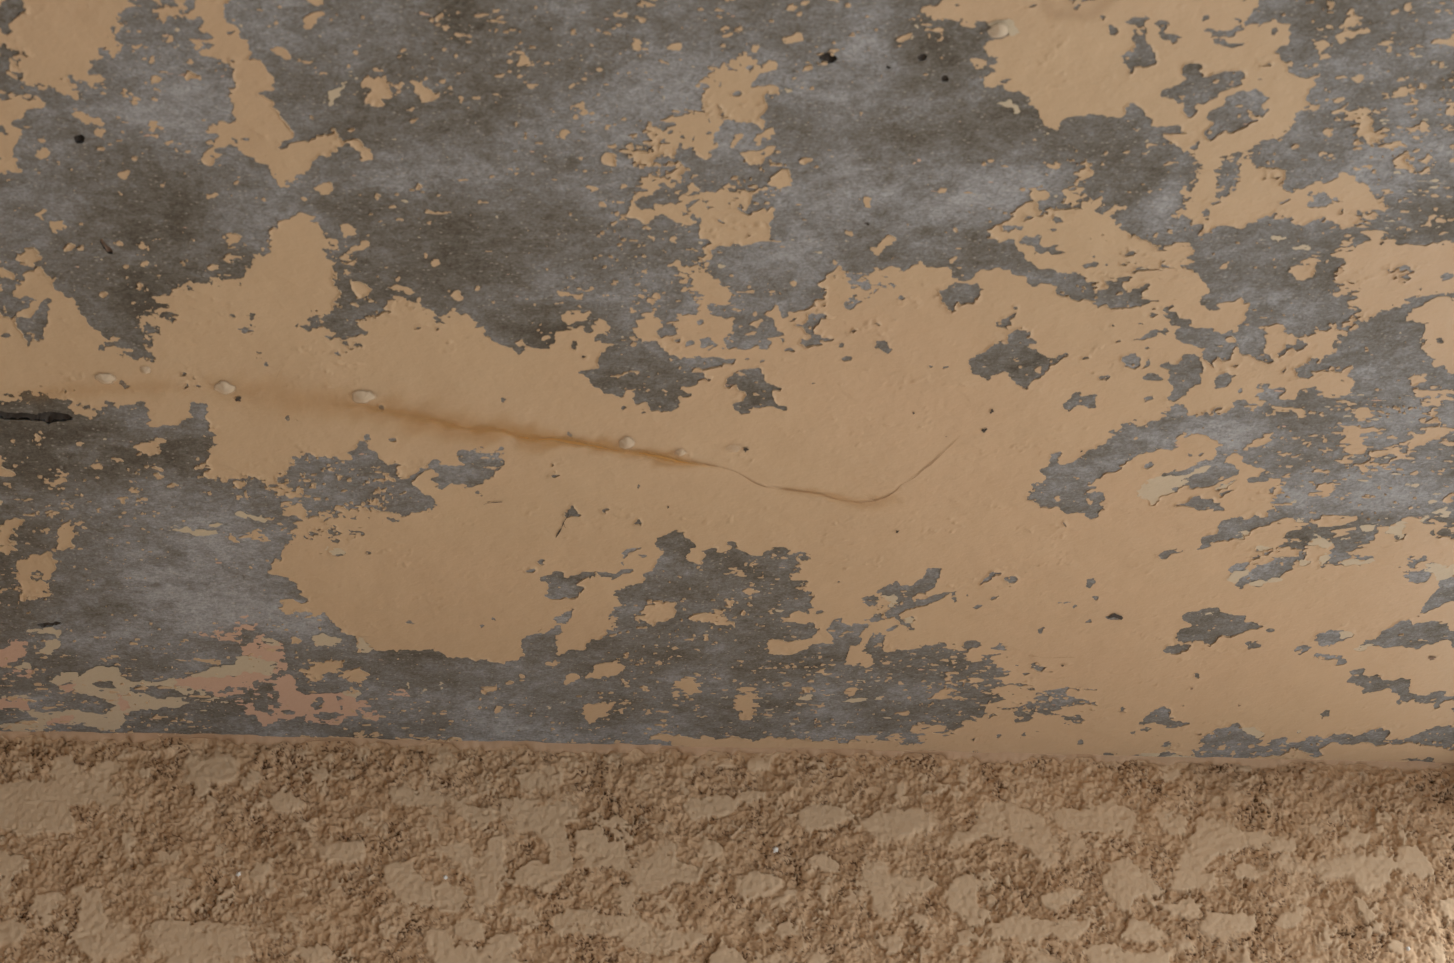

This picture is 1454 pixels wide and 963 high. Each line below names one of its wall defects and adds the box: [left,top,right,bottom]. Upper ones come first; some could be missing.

peeling [0,0,1454,589]
peeling [0,372,1097,752]
crack [692,435,961,504]
peeling [1058,578,1118,623]
peeling [1130,555,1454,762]